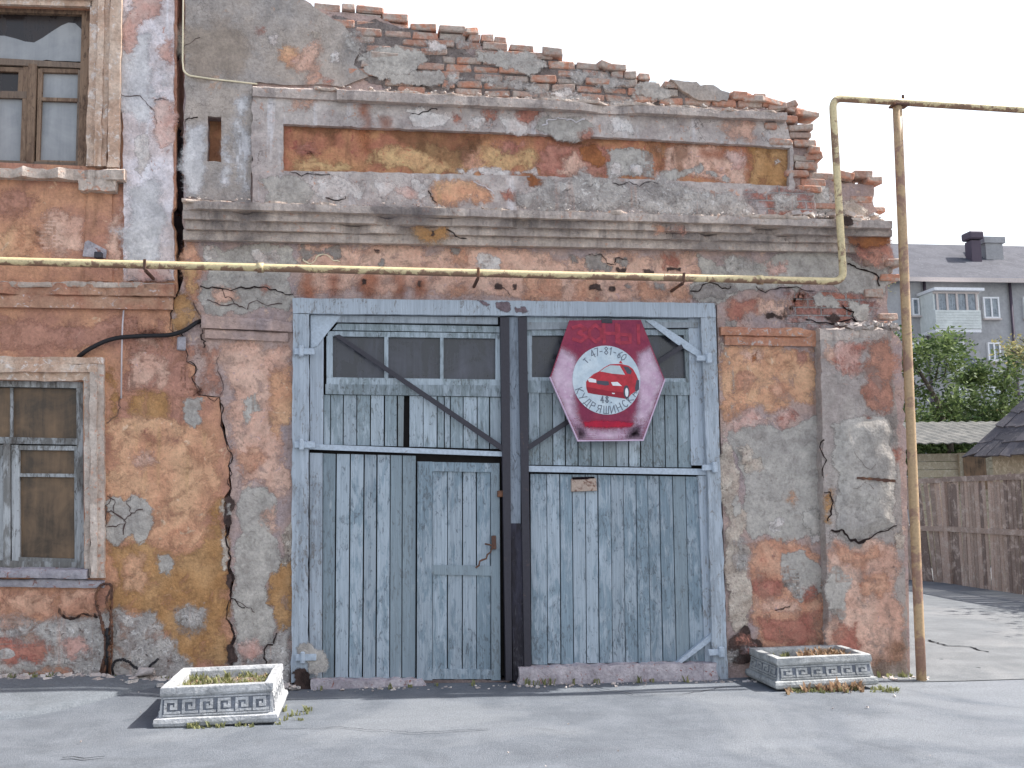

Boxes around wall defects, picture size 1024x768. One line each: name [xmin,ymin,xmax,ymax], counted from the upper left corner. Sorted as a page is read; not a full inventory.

crack [177,18,200,62]
spalling [261,28,776,178]
peeling [182,145,552,211]
spalling [477,186,895,327]
crack [121,94,245,666]
spalling [885,414,902,462]
crack [105,494,154,546]
spalling [720,405,801,664]
spalling [824,490,840,533]
crack [836,525,897,544]
spalling [0,587,193,678]